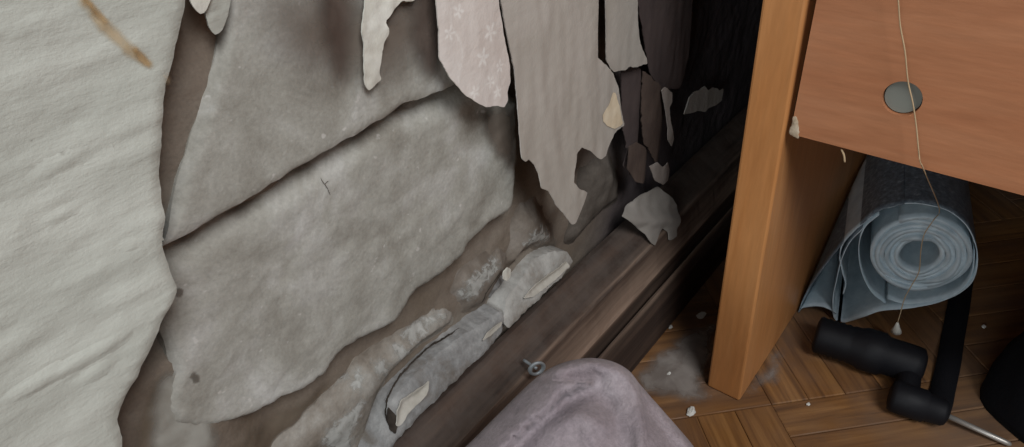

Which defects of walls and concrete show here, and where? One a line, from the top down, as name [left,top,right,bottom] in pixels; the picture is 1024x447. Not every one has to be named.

rust [83,0,150,66]
peeling [189,0,231,34]
peeling [361,0,414,90]
crack [385,328,459,434]